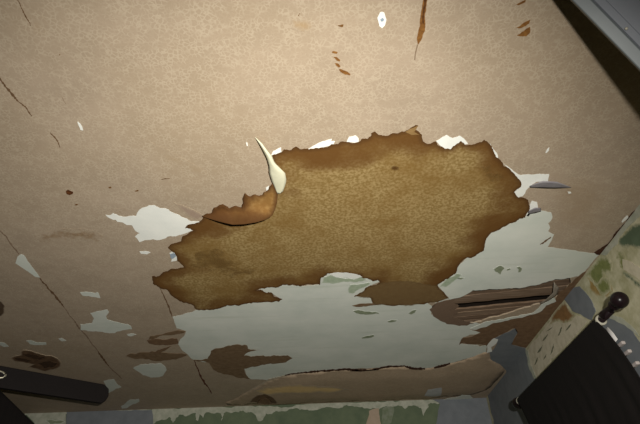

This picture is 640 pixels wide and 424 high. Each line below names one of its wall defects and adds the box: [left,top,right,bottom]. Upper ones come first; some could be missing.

rust [414,0,427,59]
rust [516,19,531,37]
rust [331,51,351,76]
crack [0,78,32,116]
leakage [152,125,530,310]
peeling [16,254,40,278]
crack [40,278,122,379]
peeling [25,201,640,424]